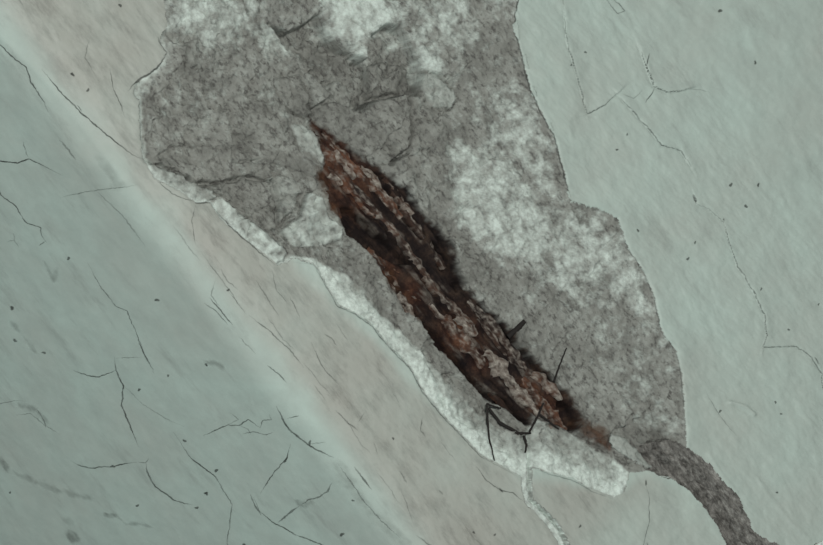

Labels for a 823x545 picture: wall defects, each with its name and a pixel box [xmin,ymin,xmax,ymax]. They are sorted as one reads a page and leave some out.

crack [2,46,119,145]
spalling [133,0,687,498]
rust [309,120,585,433]
crack [520,467,570,545]